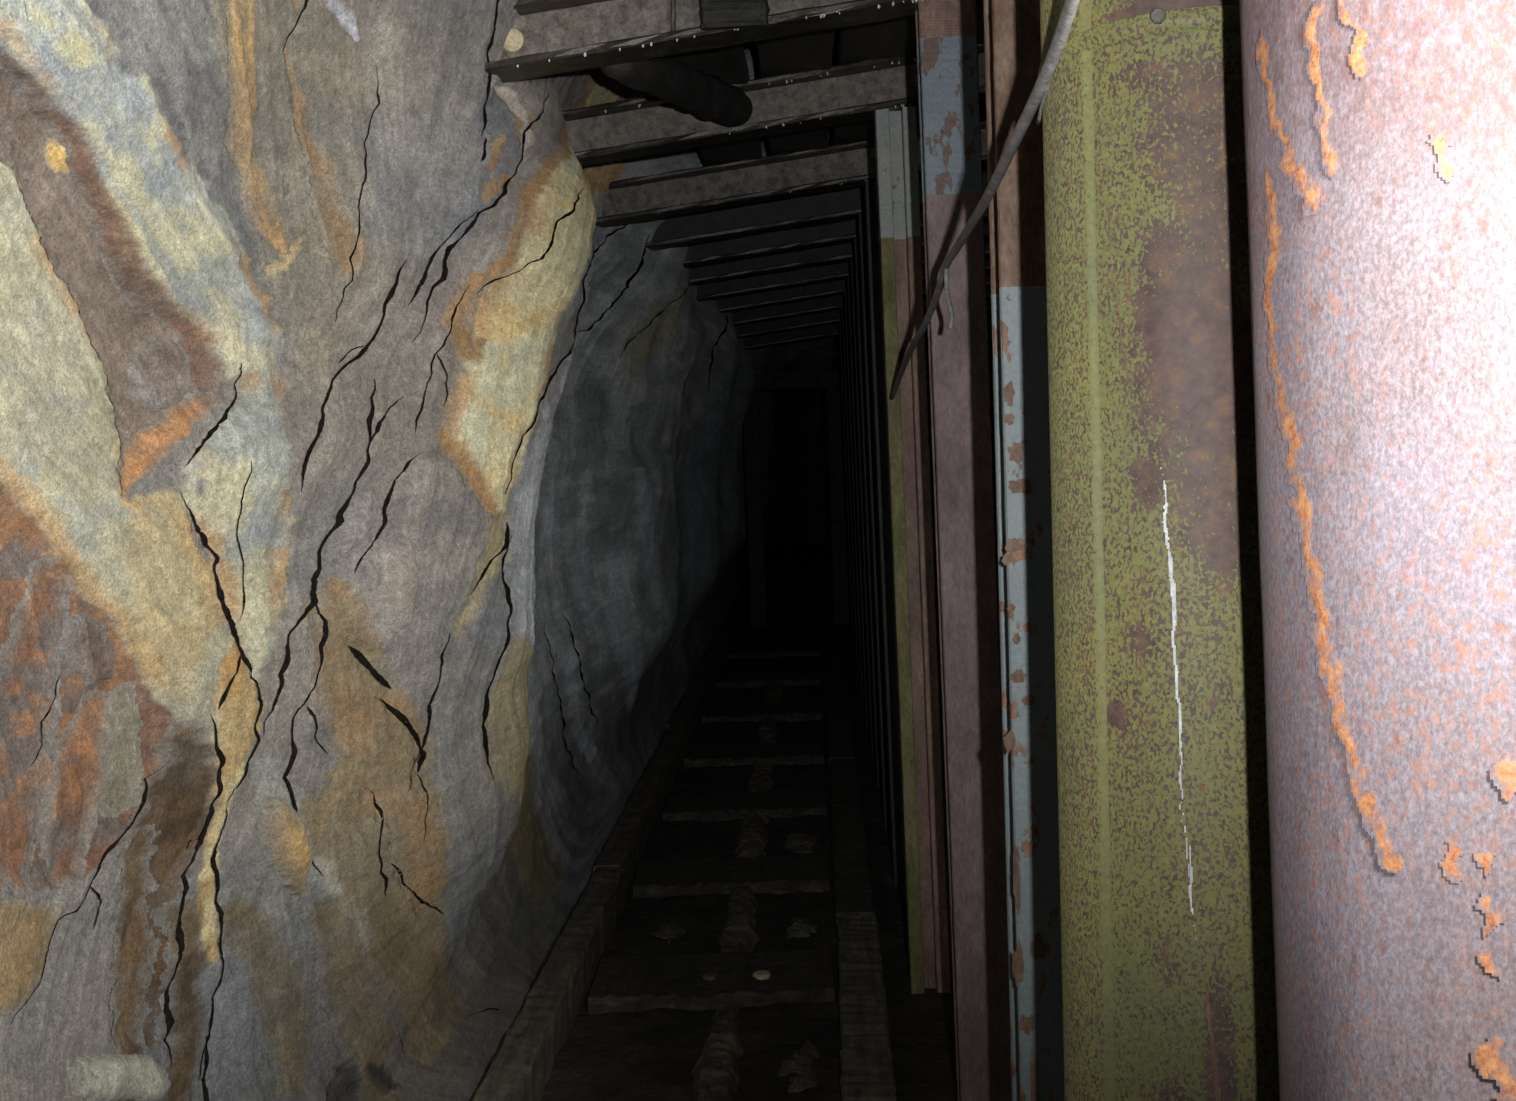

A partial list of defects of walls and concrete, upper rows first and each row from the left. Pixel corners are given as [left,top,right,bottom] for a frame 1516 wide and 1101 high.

corrosion [1427,131,1455,183]
crack [708,315,728,392]
corrosion [1002,380,1032,494]
corrosion [1255,0,1405,874]
crack [163,0,691,1101]
corrosion [1003,730,1016,754]
corrosion [1489,749,1516,802]
corrosion [1439,840,1506,980]
corrosion [1012,933,1045,986]
corrosion [1471,1033,1516,1101]